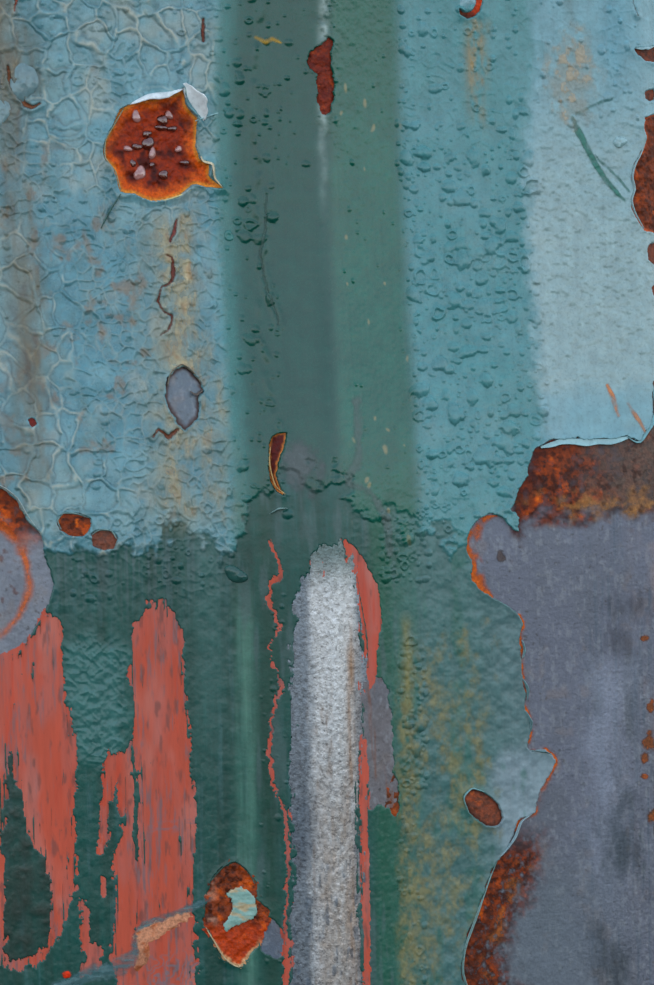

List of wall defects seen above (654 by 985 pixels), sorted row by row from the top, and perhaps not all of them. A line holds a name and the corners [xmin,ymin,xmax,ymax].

crack [7,66,41,109]
crack [199,18,207,42]
corrosion [101,83,223,229]
corrosion [631,115,654,233]
crack [157,220,177,335]
peeling [0,485,54,655]
peeling [461,381,654,985]
peeling [261,538,399,985]
peeling [132,911,193,971]
corrosion [202,859,271,969]